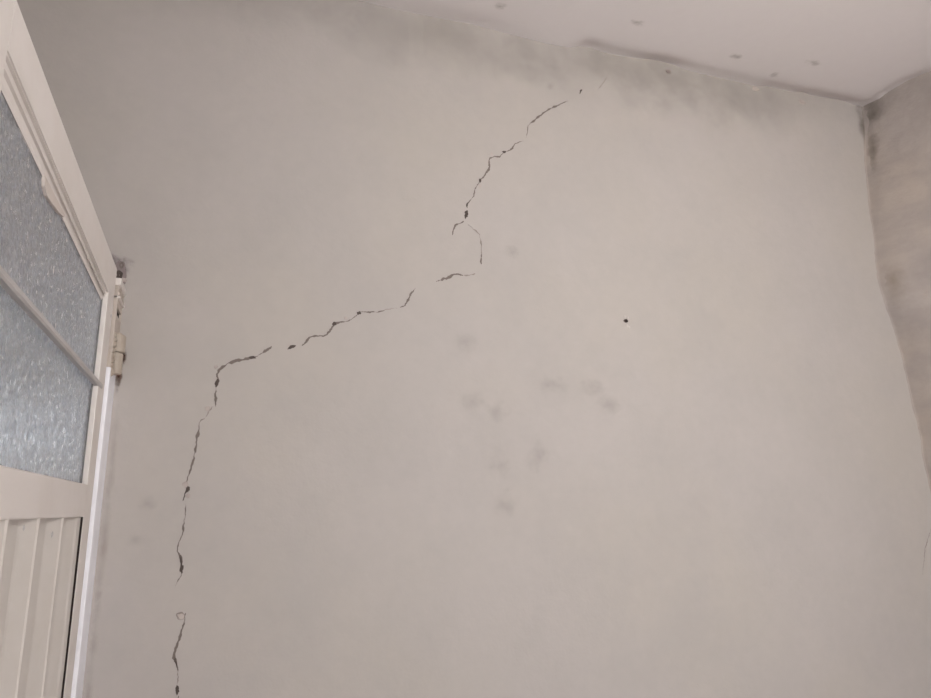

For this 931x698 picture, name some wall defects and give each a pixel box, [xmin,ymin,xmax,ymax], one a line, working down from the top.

crack [436,77,607,282]
crack [177,290,414,582]
crack [172,612,186,698]